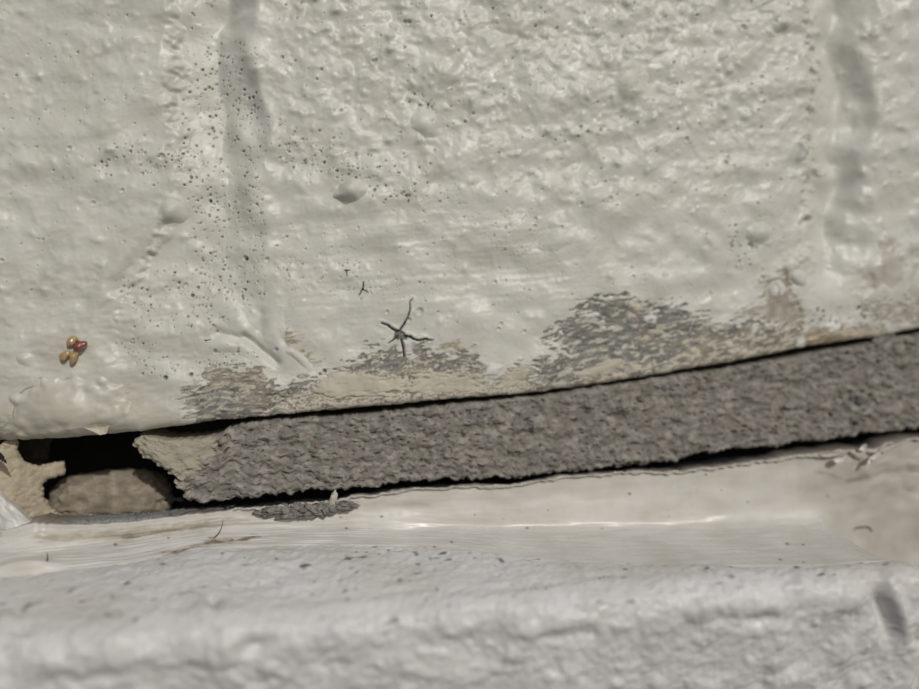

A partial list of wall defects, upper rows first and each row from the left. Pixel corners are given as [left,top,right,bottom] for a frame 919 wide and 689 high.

peeling [178,238,919,423]
crack [159,417,248,433]
crack [320,396,474,412]
spalling [0,424,180,531]
crack [164,426,919,509]